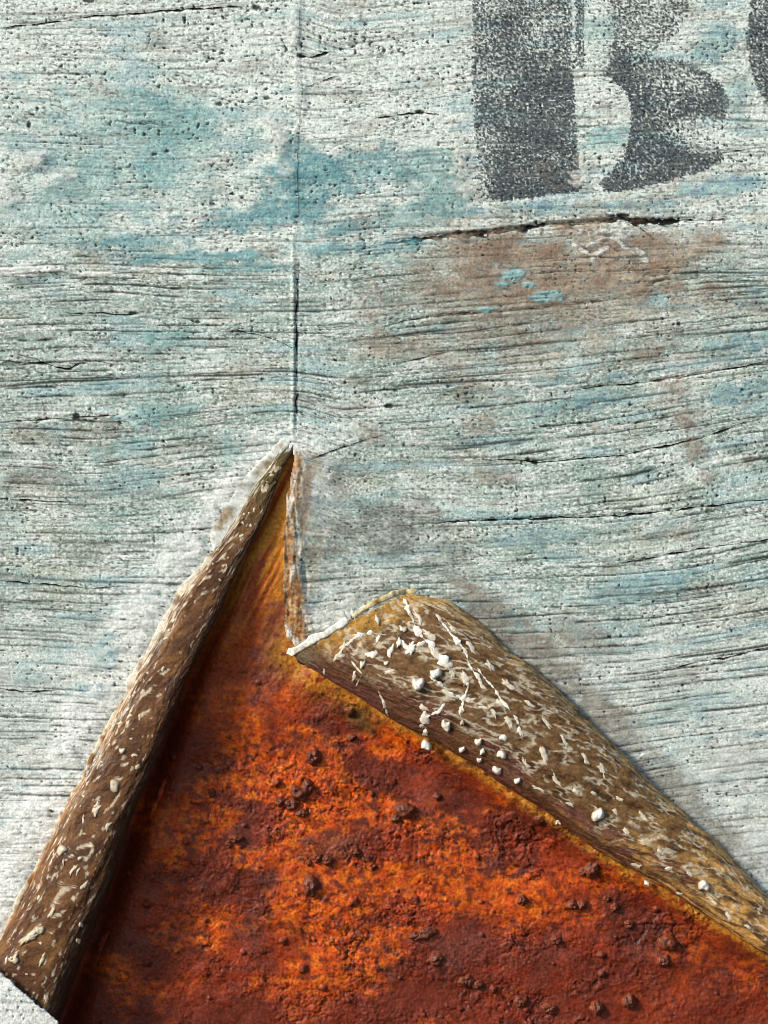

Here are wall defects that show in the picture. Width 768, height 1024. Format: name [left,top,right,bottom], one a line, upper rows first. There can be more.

crack [380,217,728,258]
peeling [0,438,300,1024]
corrosion [283,454,309,642]
peeling [285,539,768,955]